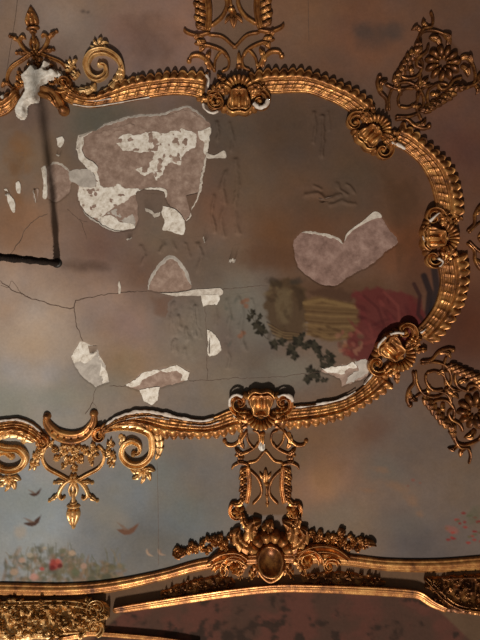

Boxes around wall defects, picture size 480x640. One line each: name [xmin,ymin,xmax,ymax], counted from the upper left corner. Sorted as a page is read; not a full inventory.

spalling [15,61,63,120]
spalling [33,106,226,235]
peeling [3,181,21,213]
spalling [293,211,398,286]
crack [0,280,147,341]
peeling [201,294,220,306]
spalling [71,341,109,387]
spalling [126,365,190,405]
spalling [207,329,221,356]
spalling [321,359,369,386]